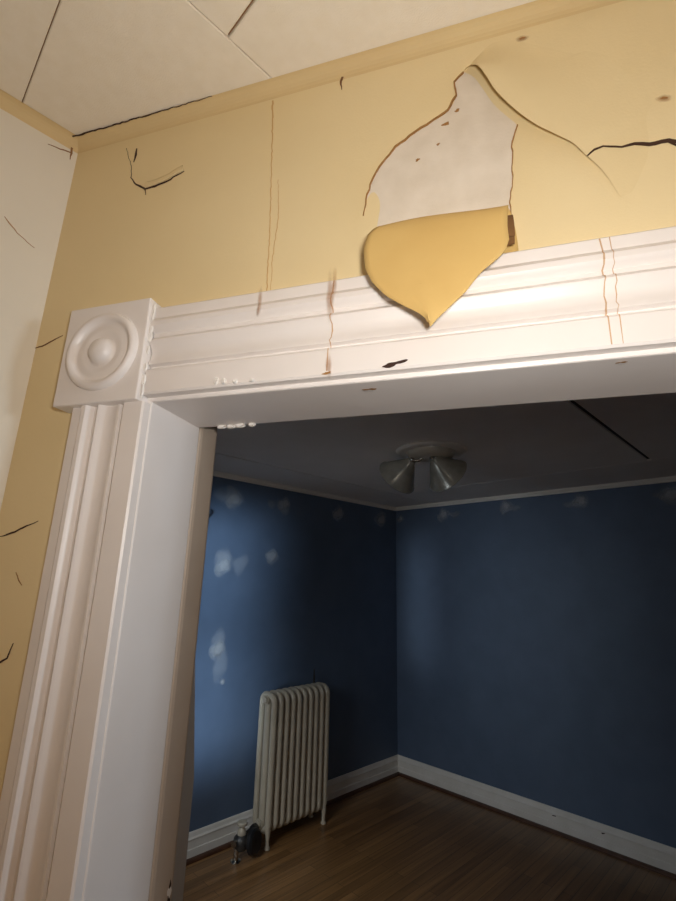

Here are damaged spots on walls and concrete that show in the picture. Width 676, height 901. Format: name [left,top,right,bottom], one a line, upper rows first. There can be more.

crack [48,96,212,159]
crack [126,148,184,195]
flaking render [367,72,517,227]
crack [587,138,676,156]
crack [326,280,335,371]
crack [0,521,38,537]